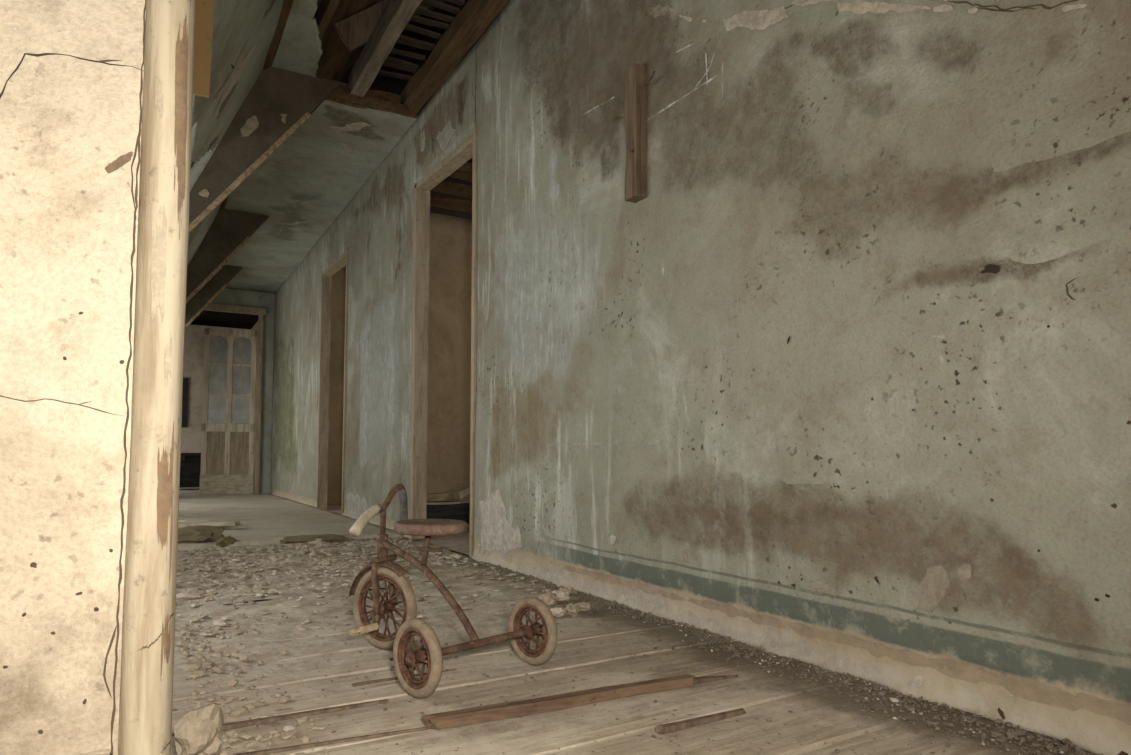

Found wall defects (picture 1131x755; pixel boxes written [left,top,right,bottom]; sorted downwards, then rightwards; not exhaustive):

crack [723,0,1087,31]
crack [0,0,174,755]
damp [627,482,1090,643]